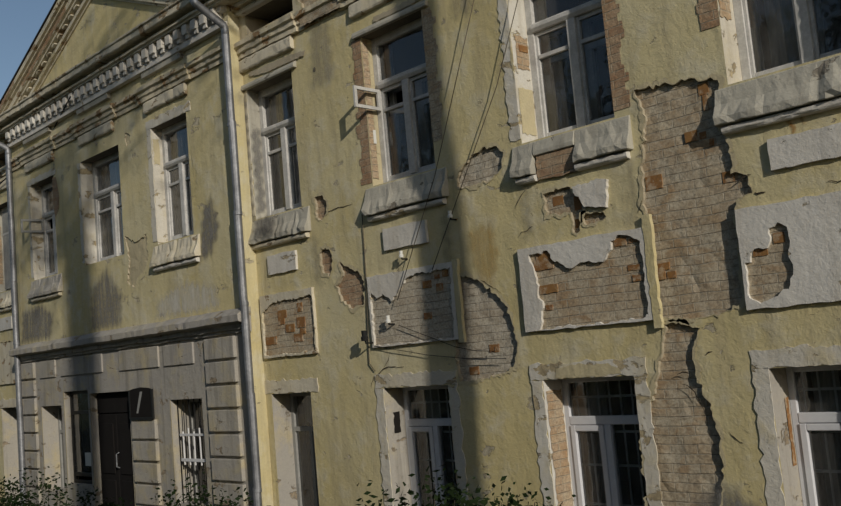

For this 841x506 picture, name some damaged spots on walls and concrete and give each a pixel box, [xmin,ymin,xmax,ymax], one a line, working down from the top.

spalling [634,77,718,214]
flaking render [722,171,737,184]
spalling [543,187,604,234]
flaking render [614,237,639,247]
flaking render [753,232,785,257]
flaking render [534,251,554,271]
flaking render [657,262,677,280]
flaking render [539,284,558,294]
flaking render [277,302,306,342]